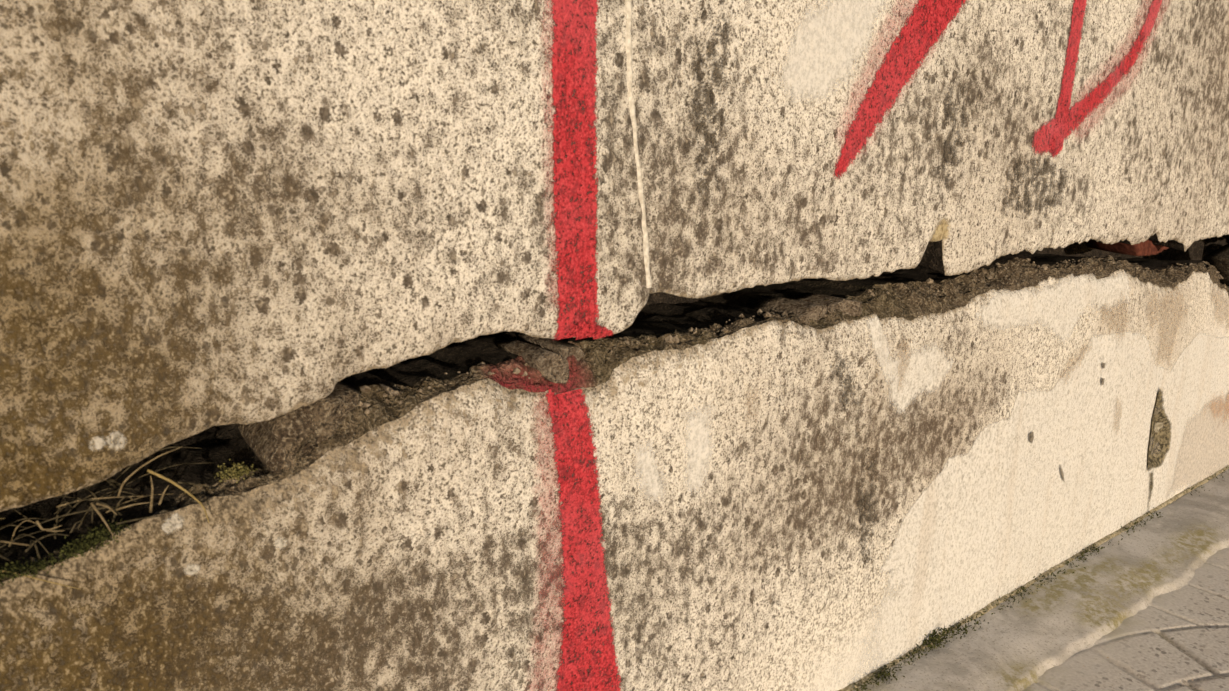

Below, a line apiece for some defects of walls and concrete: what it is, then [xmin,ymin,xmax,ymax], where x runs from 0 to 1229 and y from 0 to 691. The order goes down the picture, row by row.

crack [0,233,1229,582]
water stain [826,338,882,563]
peeling [867,316,953,413]
peeling [853,332,1229,683]
peeling [976,273,1130,343]